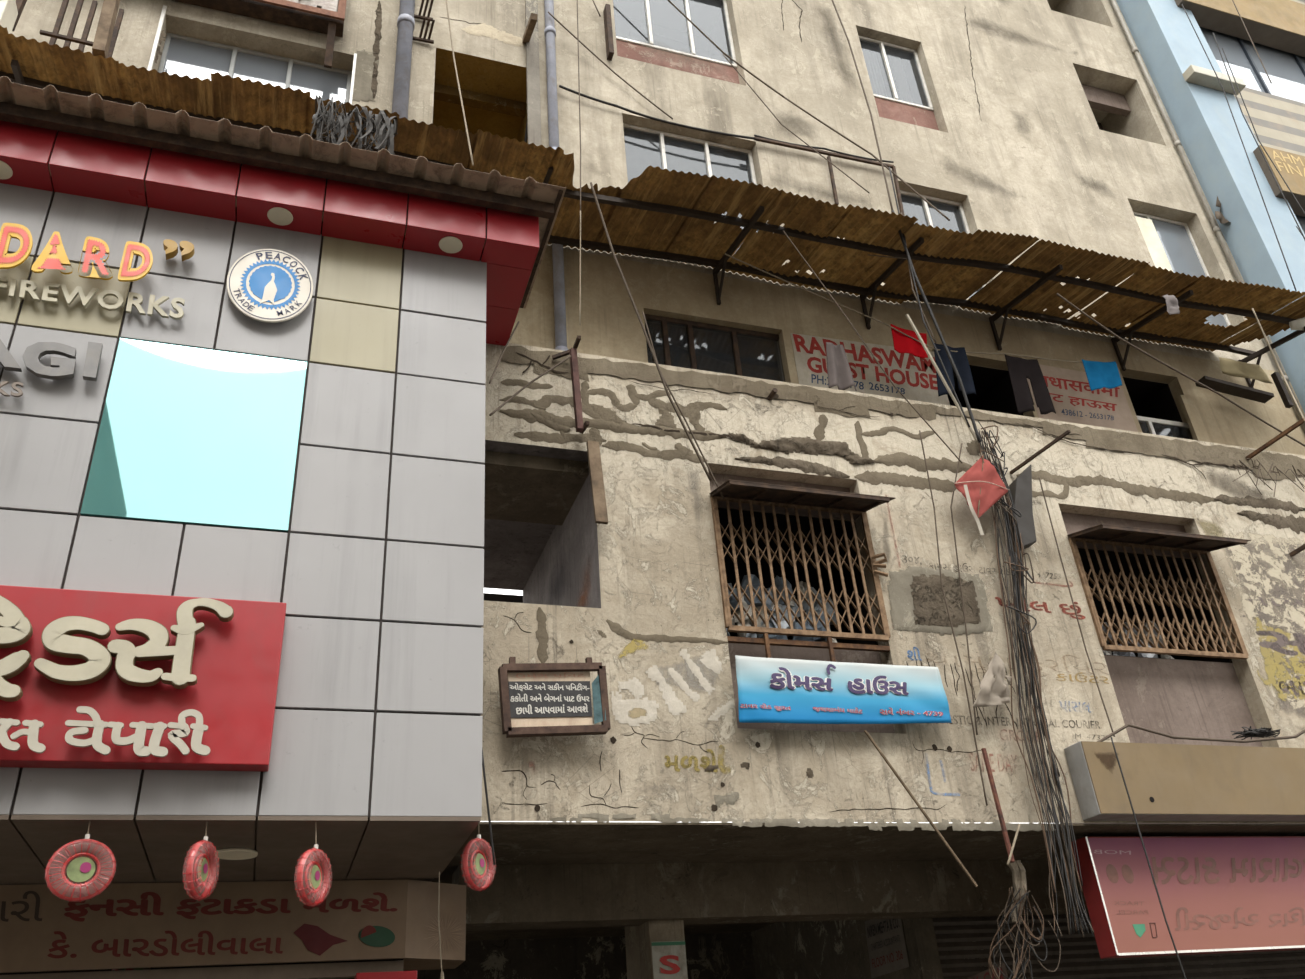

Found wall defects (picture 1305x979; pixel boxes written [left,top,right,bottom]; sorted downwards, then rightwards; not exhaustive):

flaking render [728,432,875,465]
peeling [1216,531,1305,714]
crack [502,726,718,808]